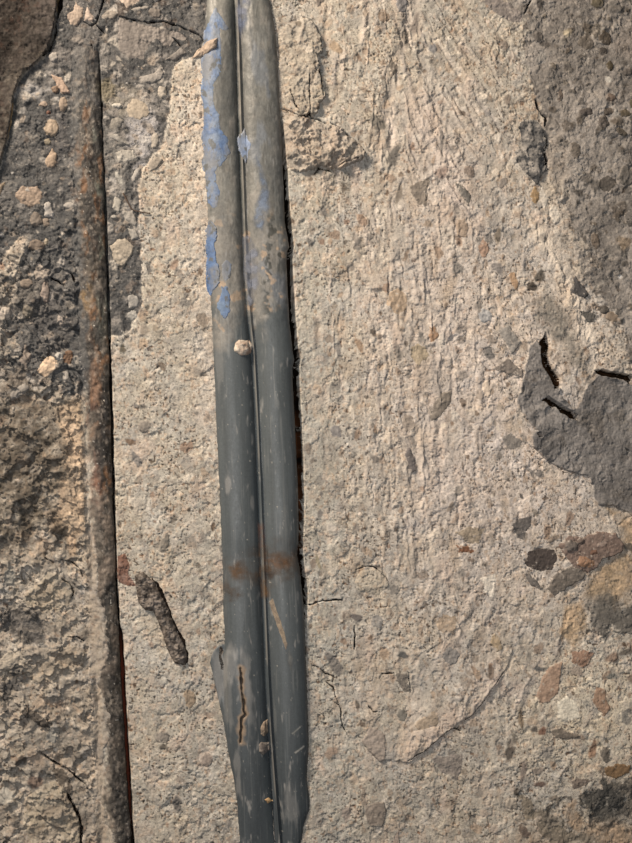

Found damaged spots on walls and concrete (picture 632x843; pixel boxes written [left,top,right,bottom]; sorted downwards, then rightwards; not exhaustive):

spalling [0,0,253,407]
crack [283,61,362,174]
spalling [506,0,632,365]
crack [283,165,342,645]
peeling [516,340,632,516]
rust [116,554,136,586]
peeling [587,591,632,637]
crack [409,671,505,761]